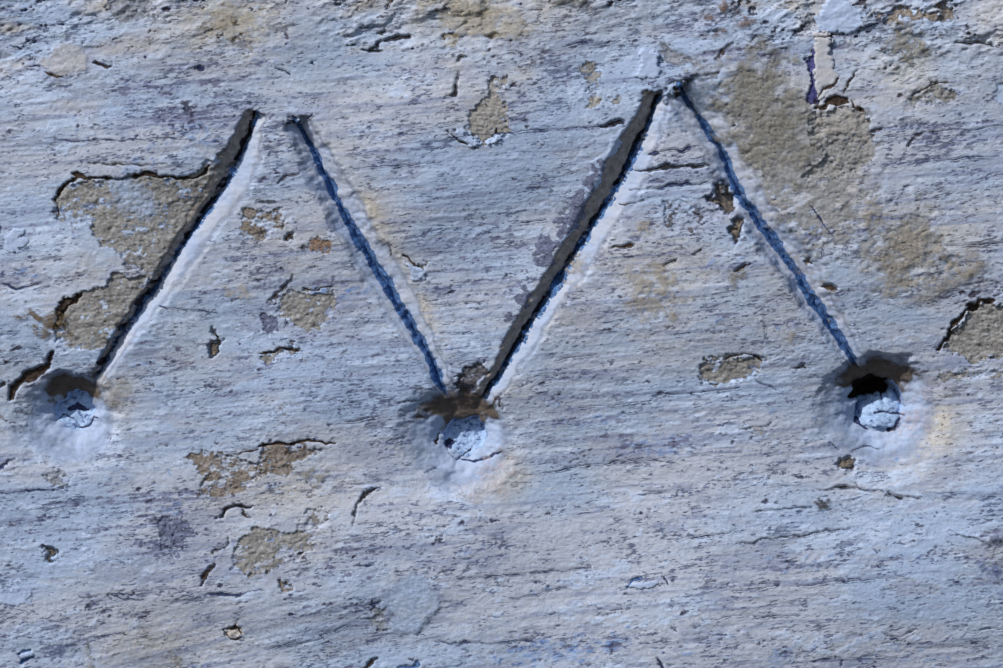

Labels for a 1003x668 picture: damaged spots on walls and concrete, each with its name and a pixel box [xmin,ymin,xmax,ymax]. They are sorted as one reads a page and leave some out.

spalling [448,76,511,149]
spalling [52,149,226,350]
spalling [210,329,225,358]
spalling [259,342,303,365]
spalling [260,286,336,337]
spalling [698,353,762,386]
spalling [936,298,1003,383]
spalling [184,438,336,498]
spalling [234,510,328,593]